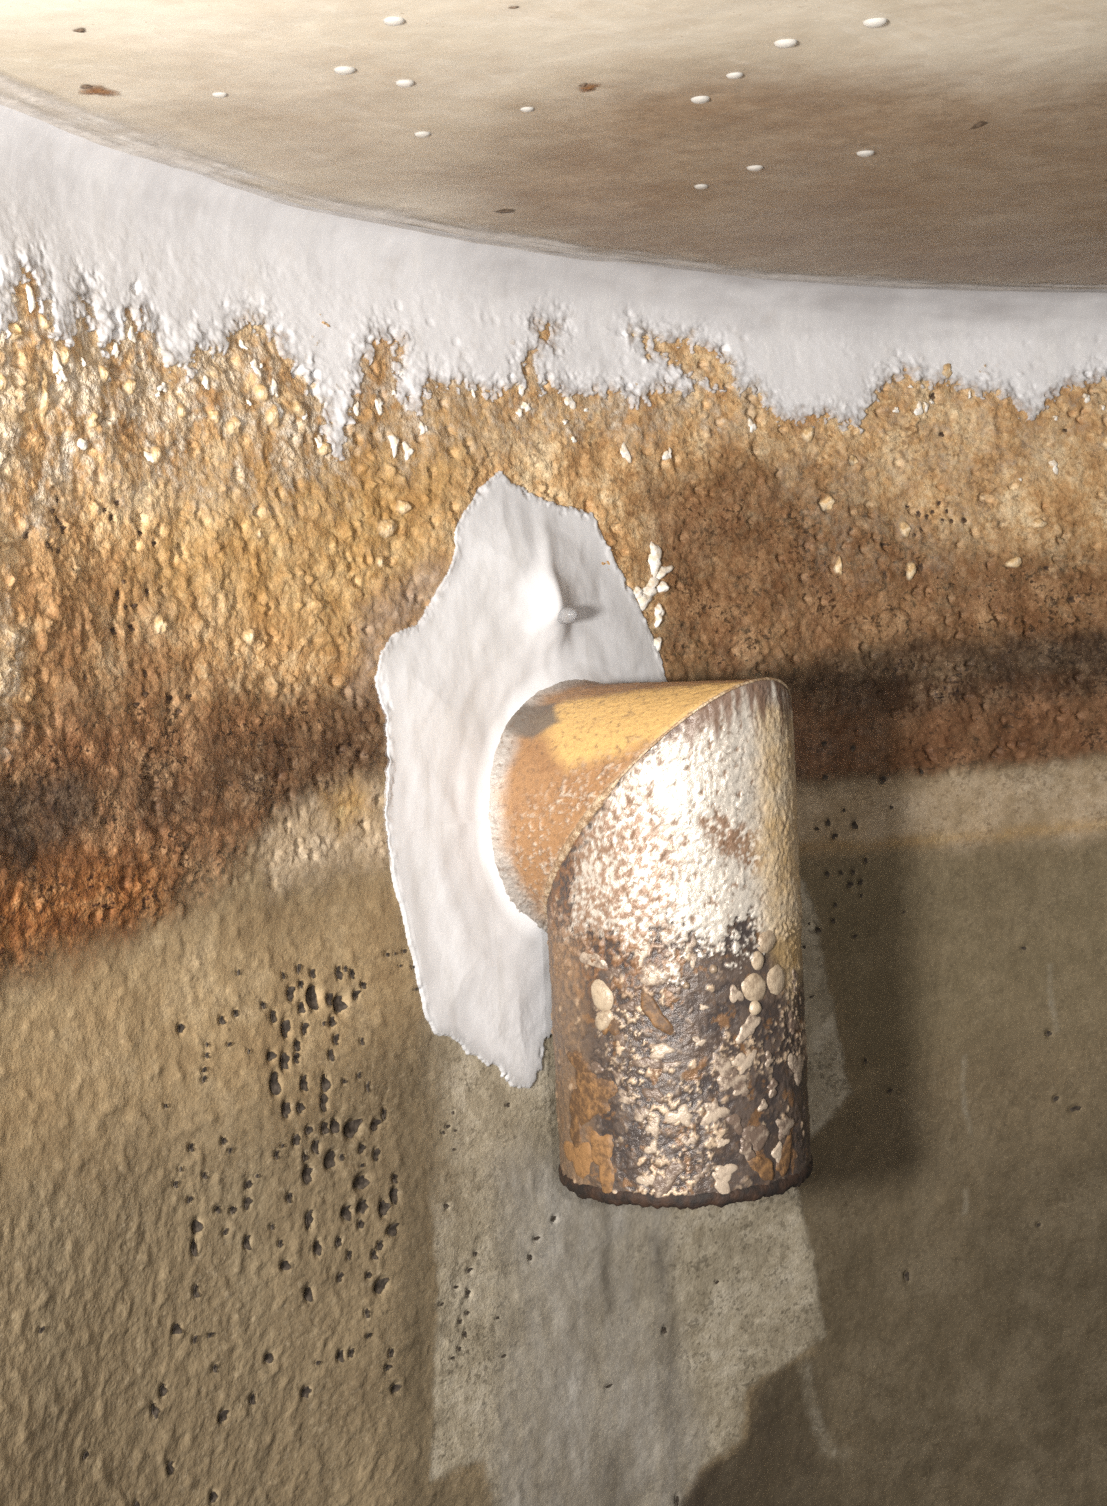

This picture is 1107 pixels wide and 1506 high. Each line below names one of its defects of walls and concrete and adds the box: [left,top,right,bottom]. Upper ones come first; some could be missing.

water stain [495,84,1107,280]
water stain [0,278,718,529]
water stain [726,375,756,430]
corrosion [0,262,1107,964]
water stain [784,632,1107,712]
water stain [0,771,94,867]
water stain [136,703,388,813]
water stain [797,762,1107,844]
water stain [431,1034,1107,1506]